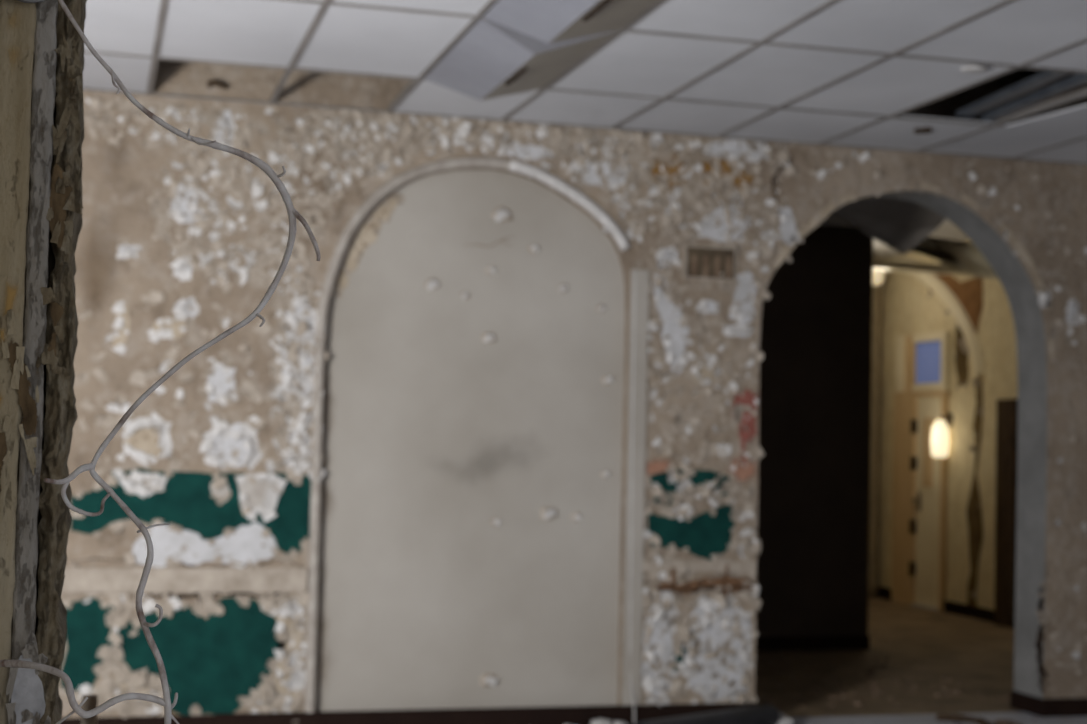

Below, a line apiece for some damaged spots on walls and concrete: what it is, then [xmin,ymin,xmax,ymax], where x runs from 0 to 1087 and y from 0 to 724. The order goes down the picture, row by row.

peeling [0,33,857,724]
peeling [808,150,870,182]
peeling [956,162,1087,380]